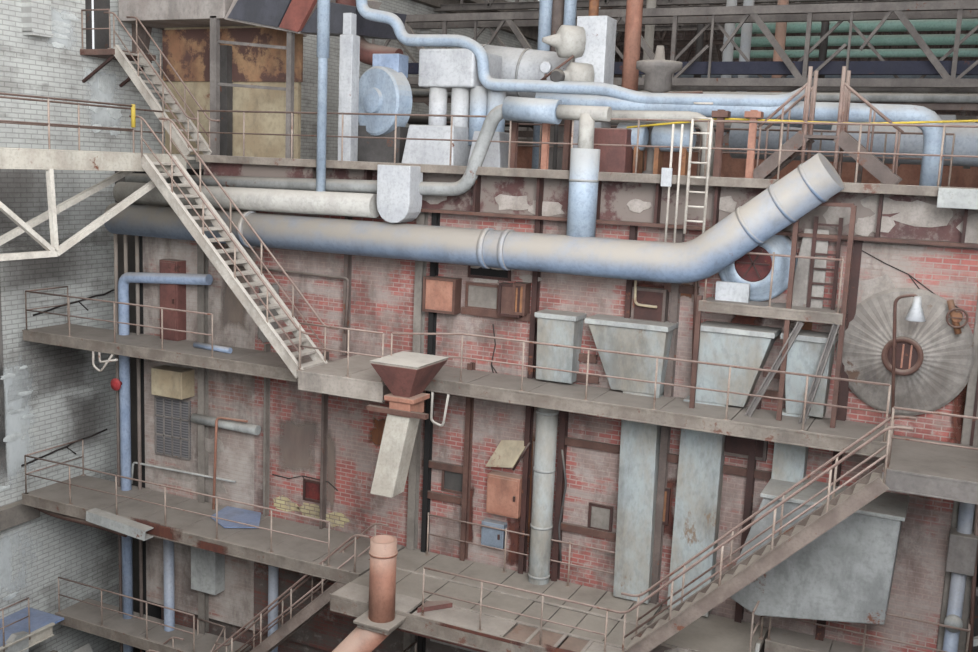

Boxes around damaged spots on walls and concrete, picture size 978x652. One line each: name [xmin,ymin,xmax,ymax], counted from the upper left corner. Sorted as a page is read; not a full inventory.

corrosion [162,28,303,82]
peeling [422,195,447,204]
peeling [495,194,565,216]
peeling [627,199,652,213]
peeling [719,196,737,213]